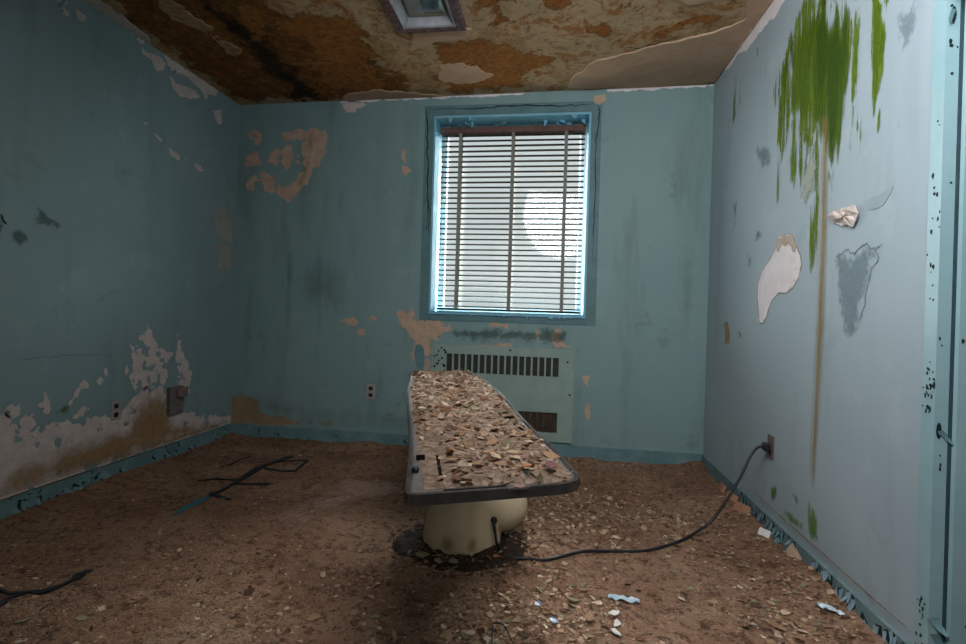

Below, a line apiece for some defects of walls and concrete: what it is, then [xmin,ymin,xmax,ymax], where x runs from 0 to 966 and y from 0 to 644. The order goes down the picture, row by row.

peeling [55,0,219,99]
peeling [154,0,242,56]
leakage [200,0,319,102]
peeling [340,63,524,113]
peeling [409,28,471,50]
peeling [567,0,785,105]
peeling [244,127,328,204]
leakage [773,0,833,457]
peeling [757,234,802,324]
peeling [837,250,871,333]
peeling [396,308,451,372]
peeling [0,325,312,514]